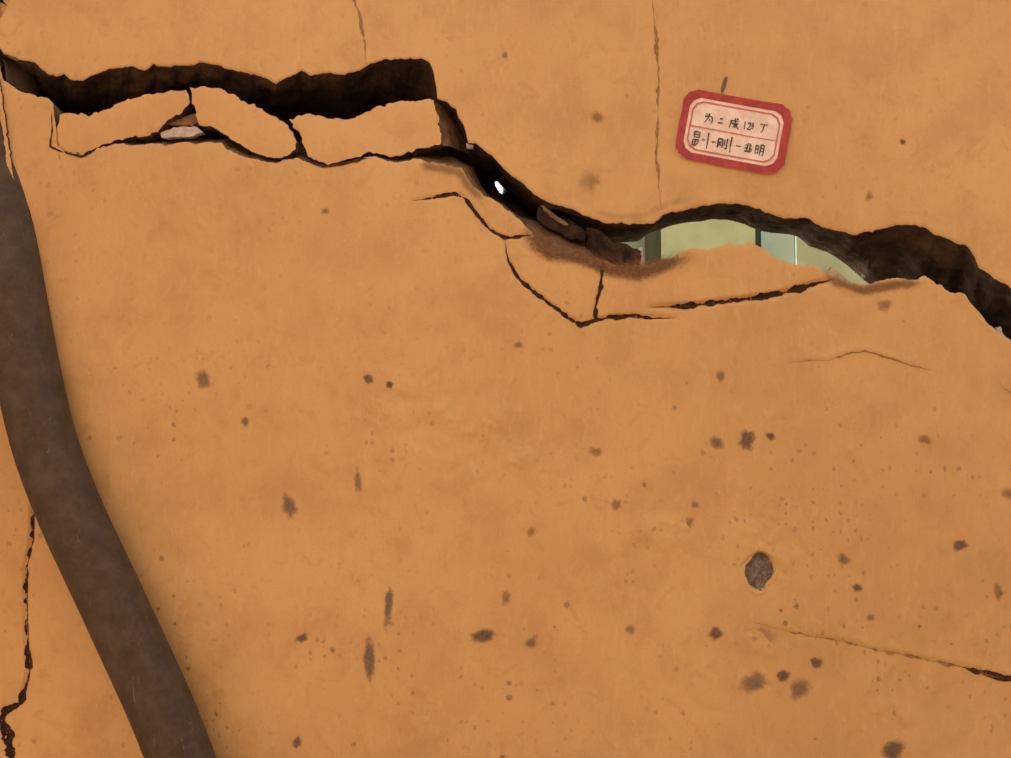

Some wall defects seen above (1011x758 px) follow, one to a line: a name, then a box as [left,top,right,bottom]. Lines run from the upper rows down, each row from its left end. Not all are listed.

spalling [0,50,14,179]
crack [0,0,1011,340]
crack [0,514,35,758]
spalling [740,553,780,596]
crack [754,622,1011,682]